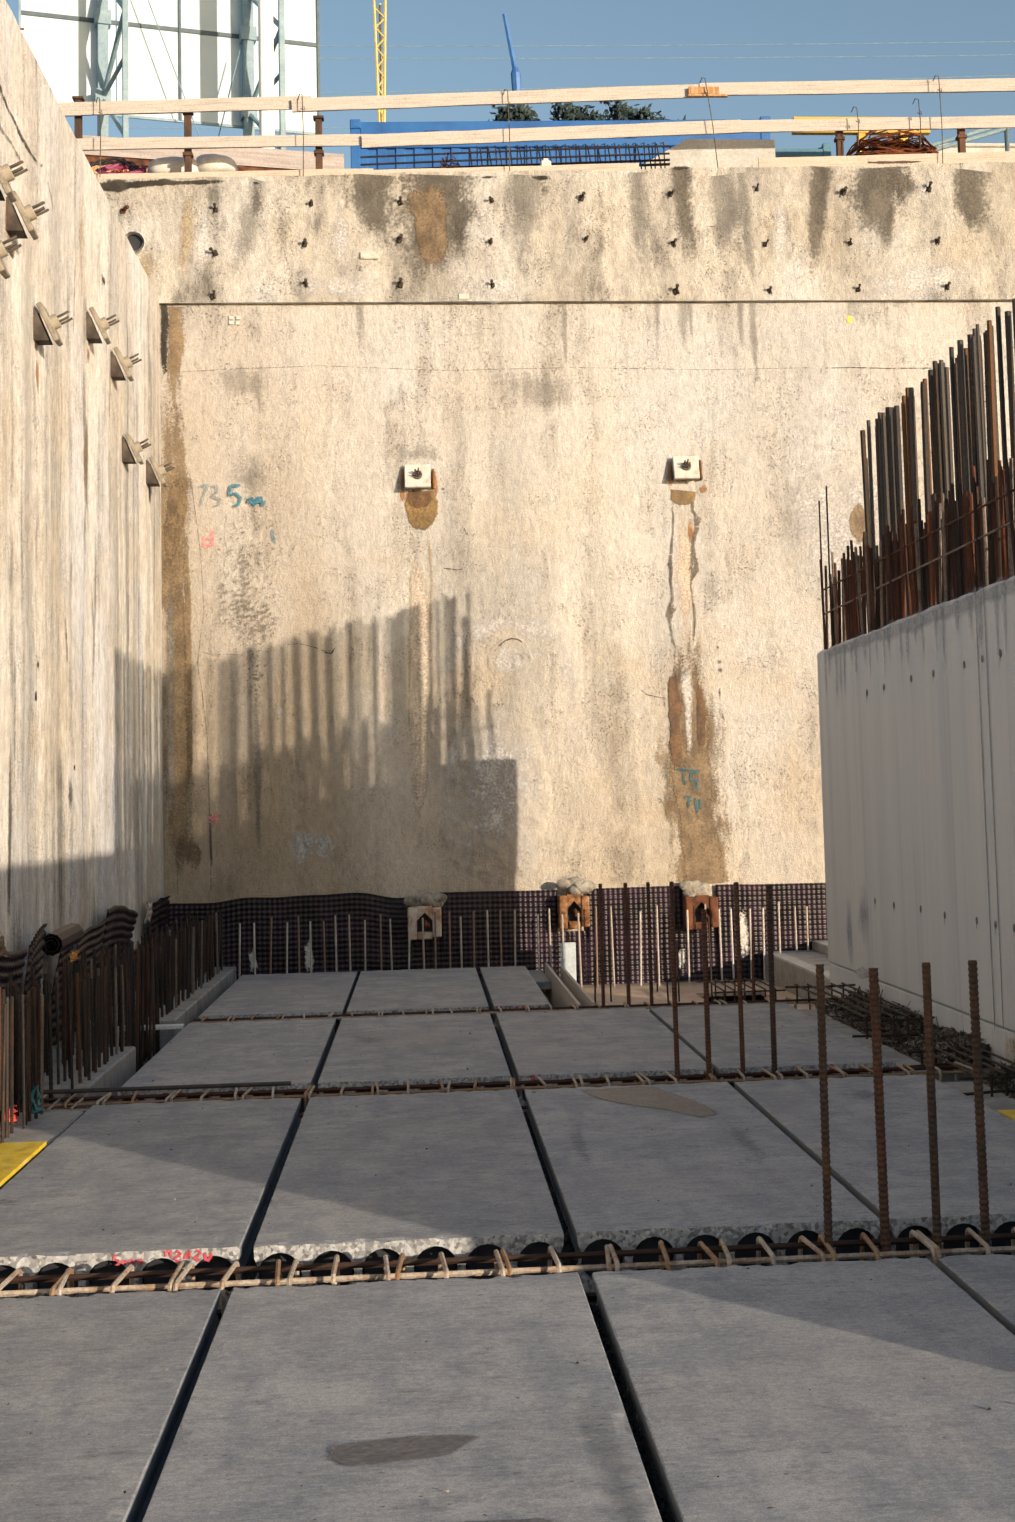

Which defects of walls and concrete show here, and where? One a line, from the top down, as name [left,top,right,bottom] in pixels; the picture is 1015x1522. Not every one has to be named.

water stain [100,178,225,192]
water stain [336,174,496,279]
water stain [672,166,696,255]
water stain [712,175,754,269]
water stain [808,166,831,273]
water stain [848,161,926,244]
water stain [954,169,991,233]
water stain [876,269,951,294]
water stain [160,305,201,869]
corrosion [666,470,707,646]
corrosion [401,473,444,810]
water stain [329,1435,478,1465]